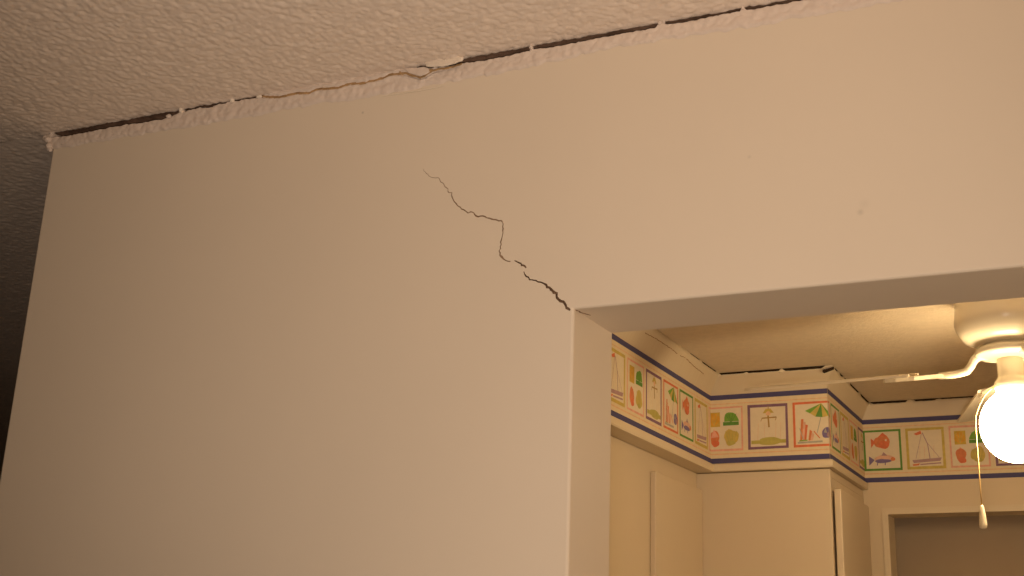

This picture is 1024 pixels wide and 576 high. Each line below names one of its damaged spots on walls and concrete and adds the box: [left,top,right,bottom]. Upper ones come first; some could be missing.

crack [262,71,432,99]
crack [426,173,591,316]